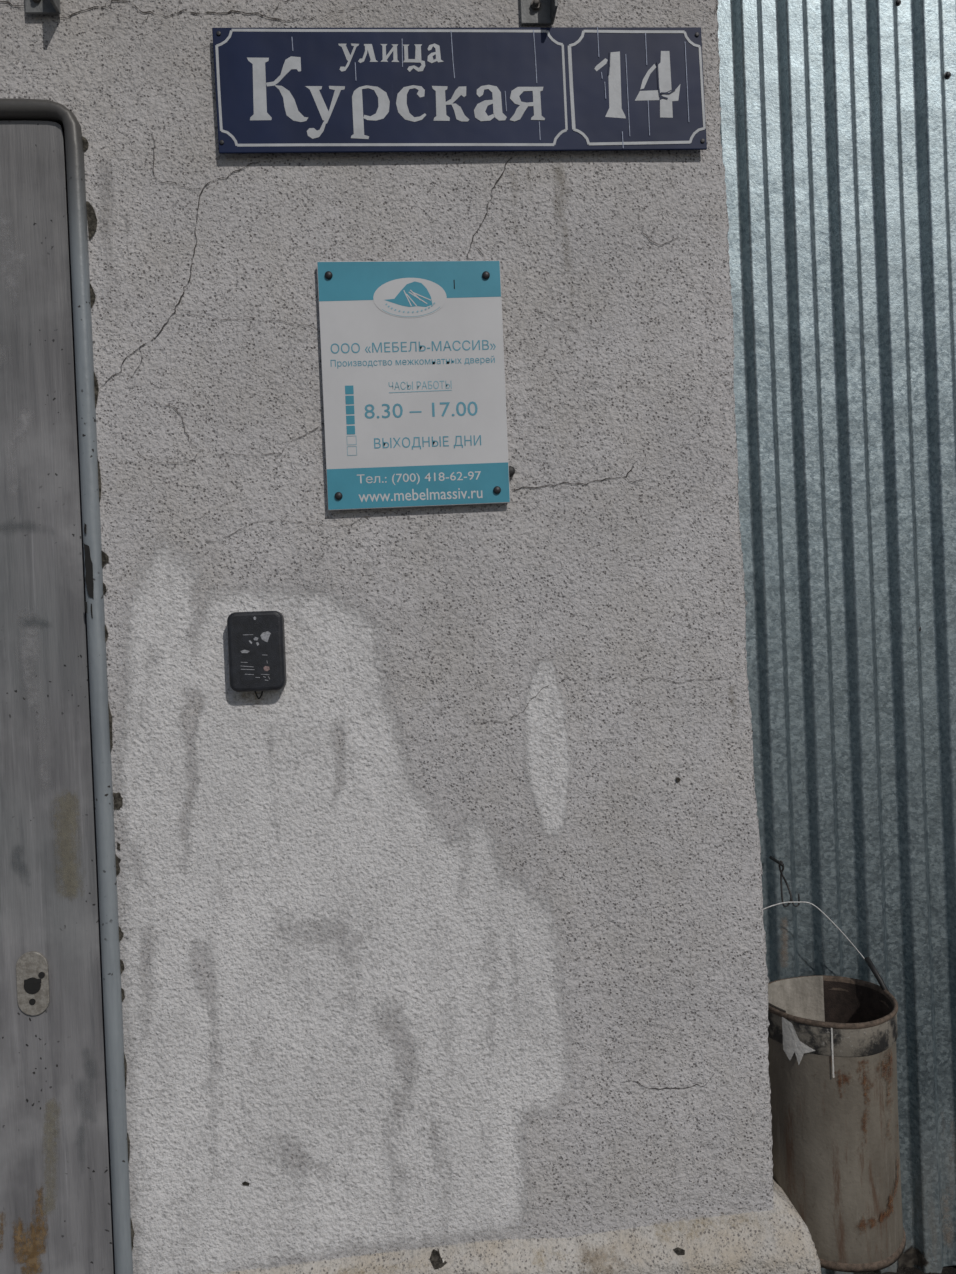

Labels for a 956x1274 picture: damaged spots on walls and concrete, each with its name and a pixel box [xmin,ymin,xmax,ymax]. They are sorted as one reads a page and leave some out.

crack [61,0,378,25]
crack [100,132,319,469]